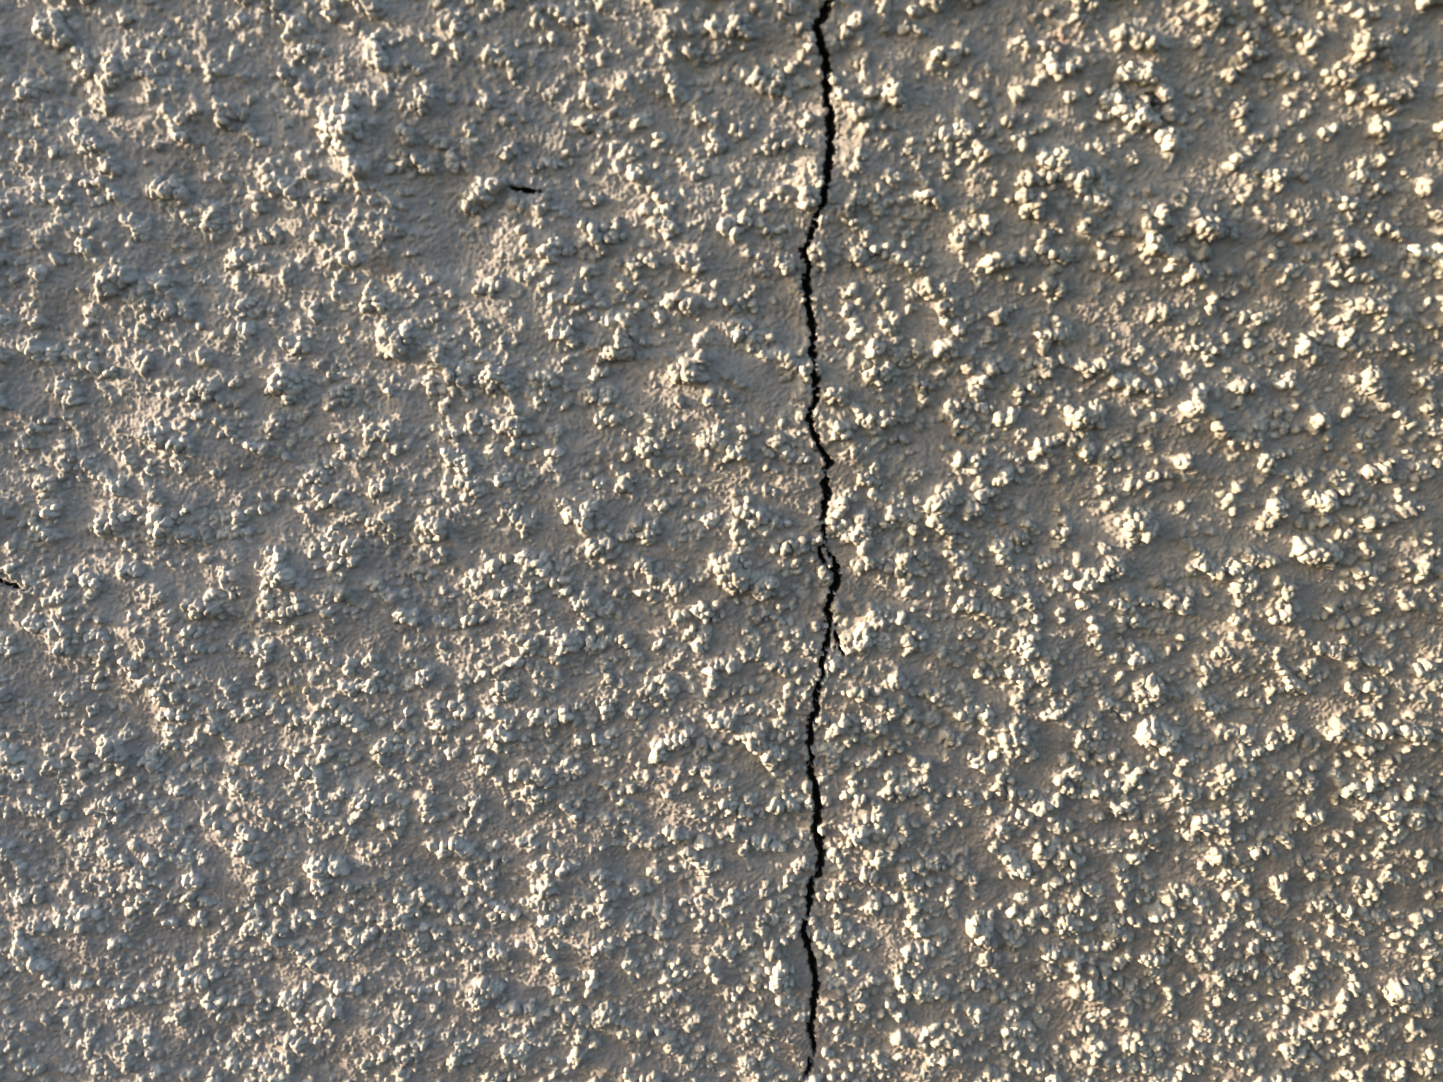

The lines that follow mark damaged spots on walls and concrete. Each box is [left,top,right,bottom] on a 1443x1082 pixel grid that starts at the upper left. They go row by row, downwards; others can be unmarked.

crack [799,0,844,1079]